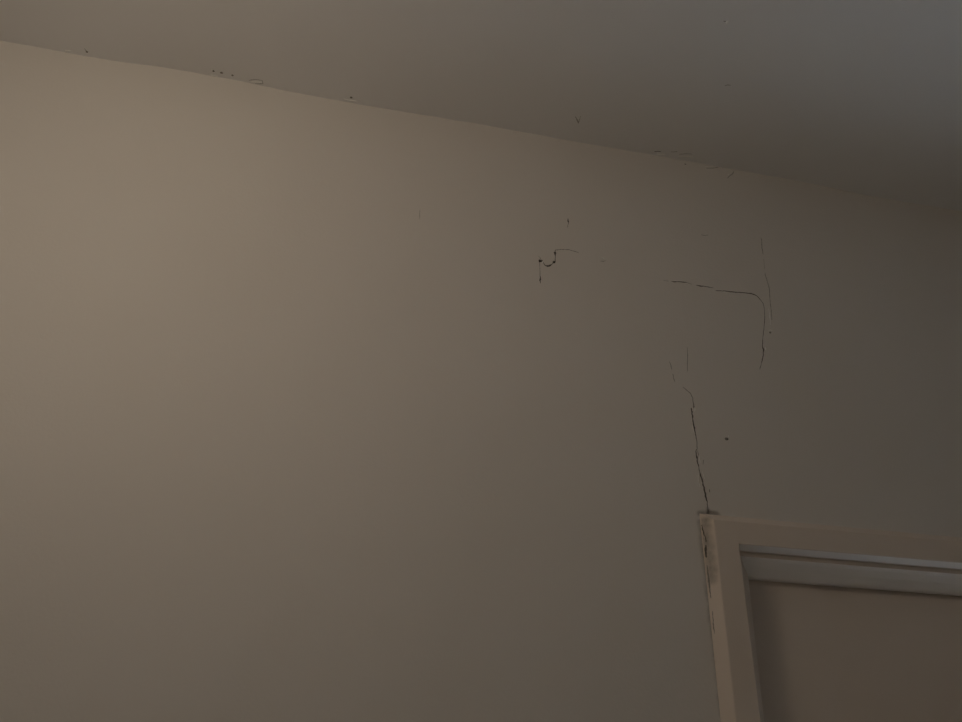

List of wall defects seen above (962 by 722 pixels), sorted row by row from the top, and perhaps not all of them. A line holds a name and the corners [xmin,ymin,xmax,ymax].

crack [539,219,579,283]
crack [664,239,772,367]
crack [669,349,715,634]